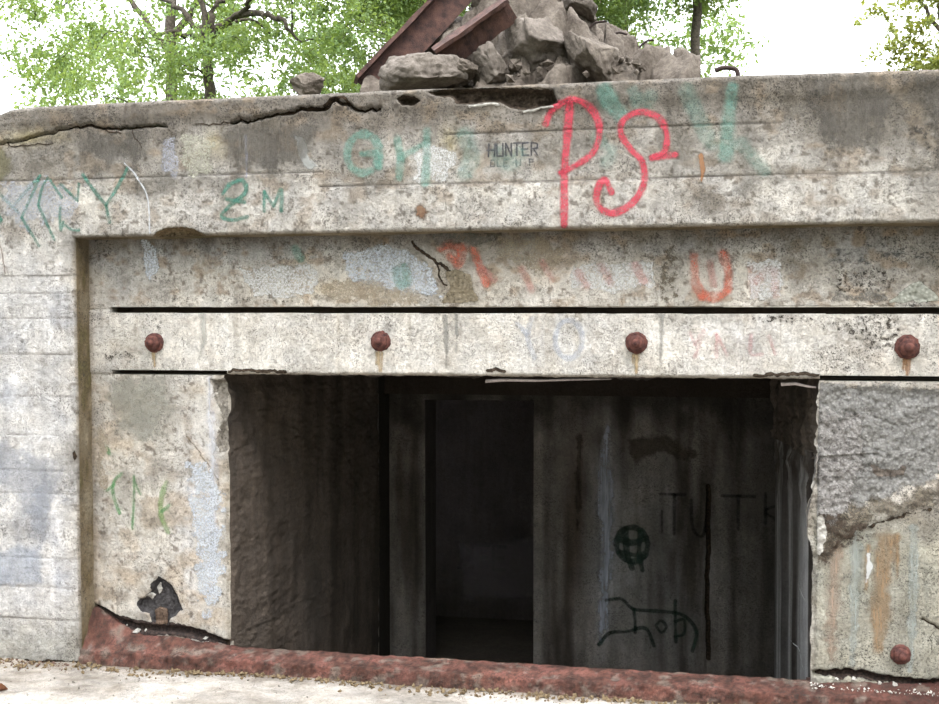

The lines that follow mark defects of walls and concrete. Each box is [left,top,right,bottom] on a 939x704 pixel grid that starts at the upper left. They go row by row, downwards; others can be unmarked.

crack [6,124,166,148]
crack [411,240,451,286]
spalling [753,371,939,564]
spalling [137,576,183,625]
crack [815,668,939,686]